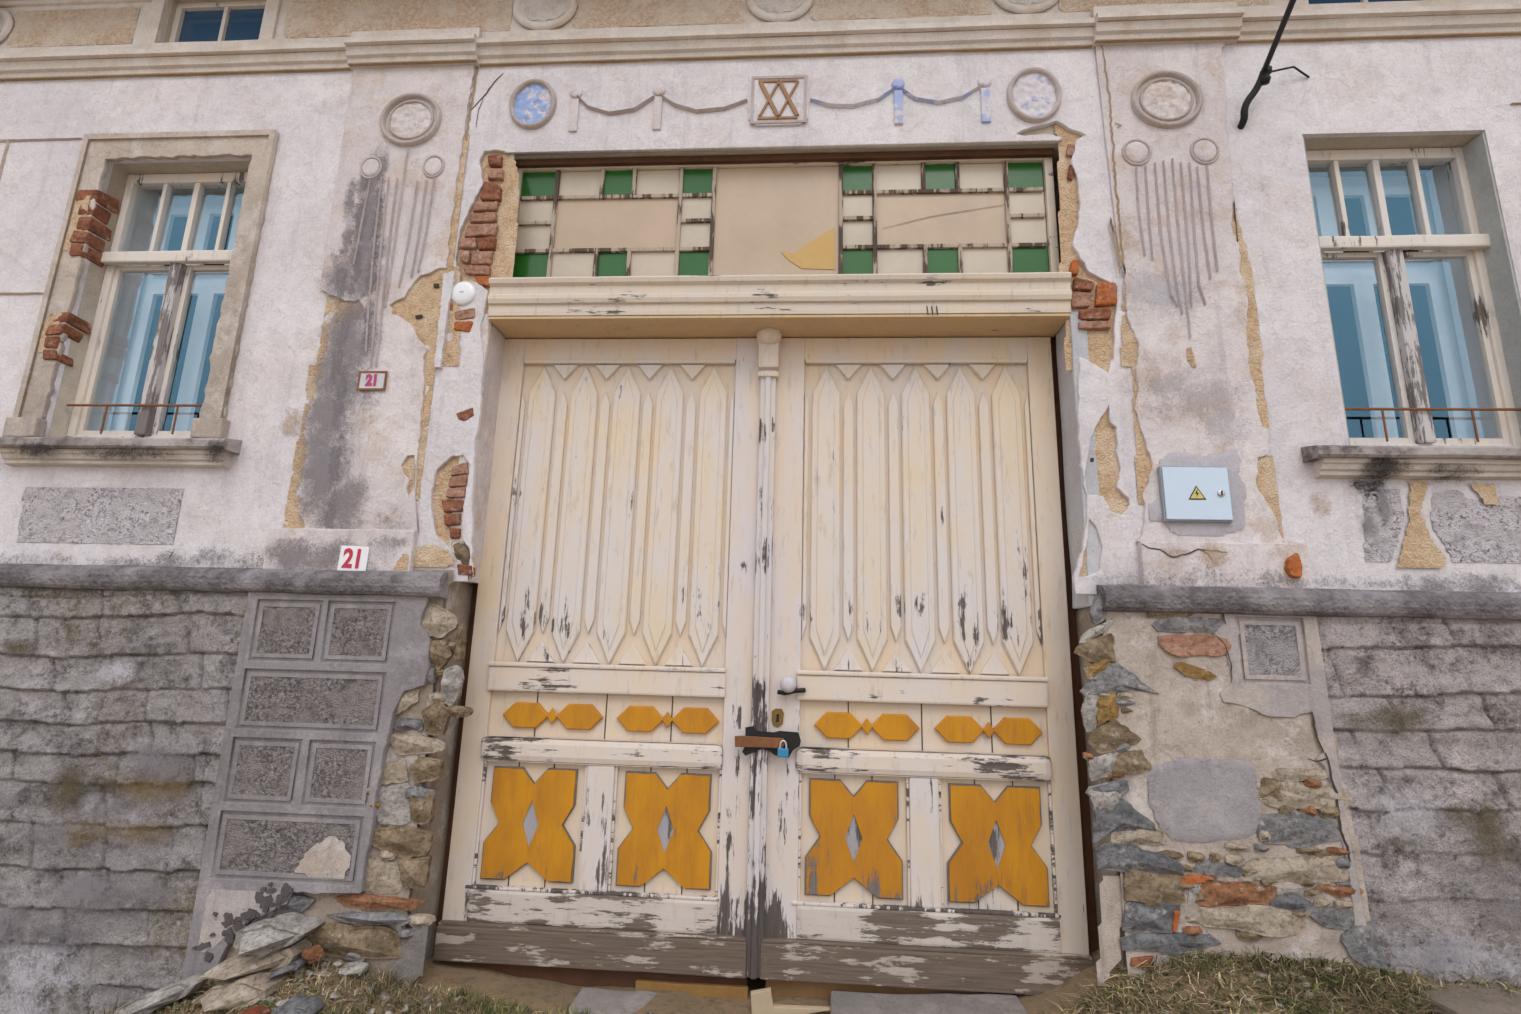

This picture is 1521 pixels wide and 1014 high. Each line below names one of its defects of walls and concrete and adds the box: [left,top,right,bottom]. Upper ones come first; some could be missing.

spalling [63,190,120,268]
spalling [37,312,91,367]
damp [331,156,387,414]
flaking render [1054,125,1152,515]
spalling [191,134,520,975]
flaking render [1079,525,1087,577]
flaking render [1256,455,1284,539]
flaking render [1284,553,1302,579]
damp [1353,458,1409,535]
flaking render [1397,481,1446,568]
damp [1429,464,1482,481]
spalling [1074,584,1390,979]